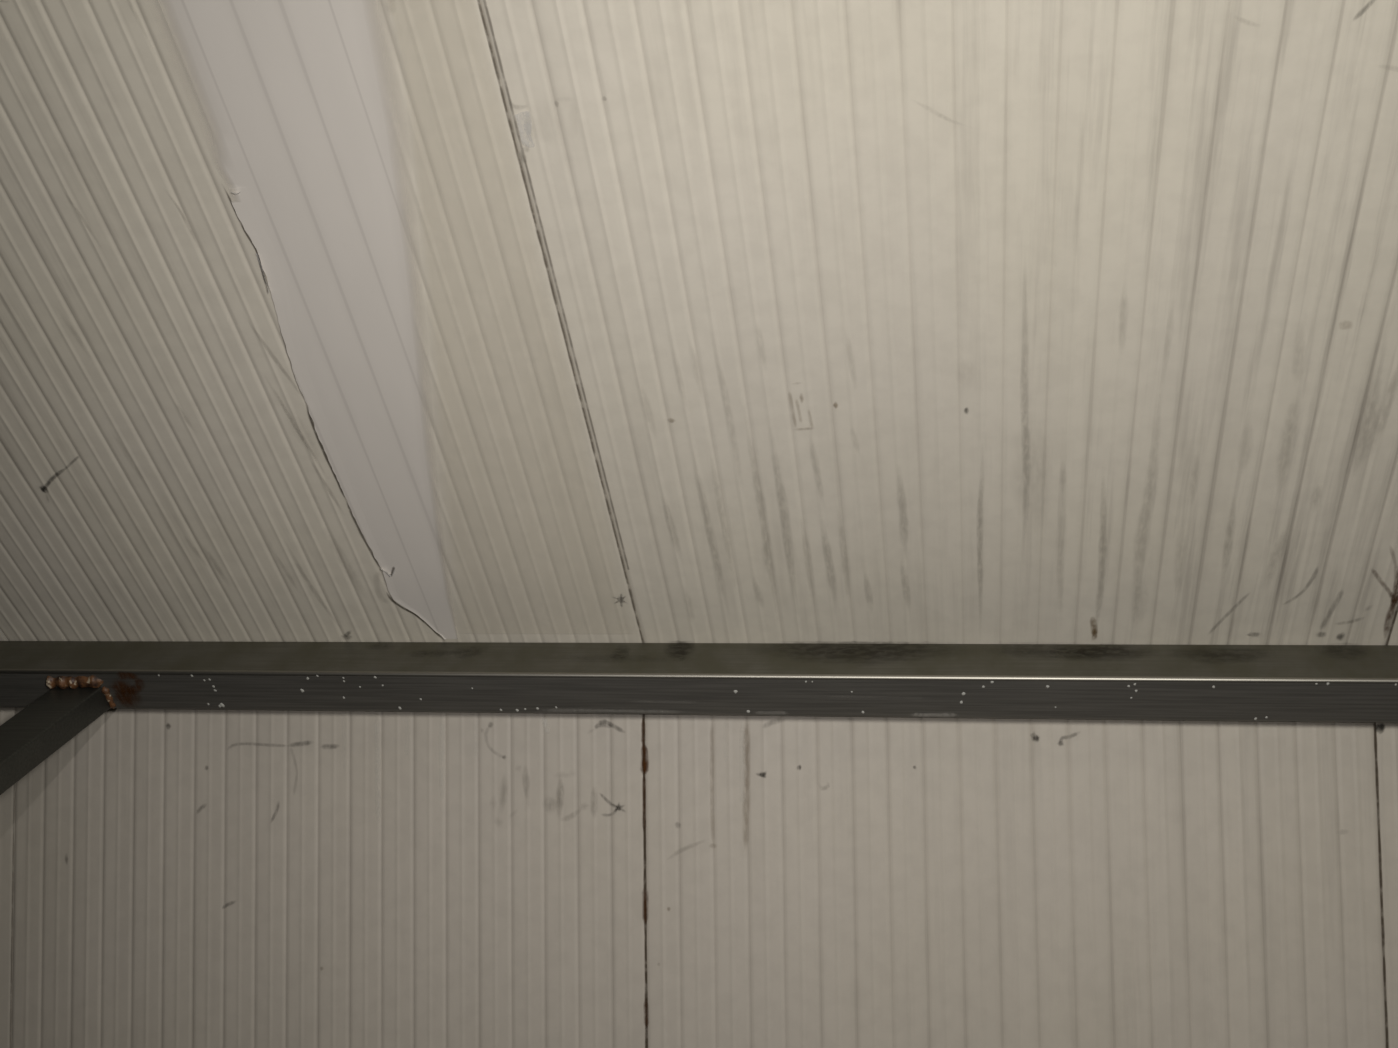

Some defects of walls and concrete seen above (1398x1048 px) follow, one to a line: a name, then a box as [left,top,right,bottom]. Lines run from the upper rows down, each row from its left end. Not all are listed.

peeling [164,0,457,640]